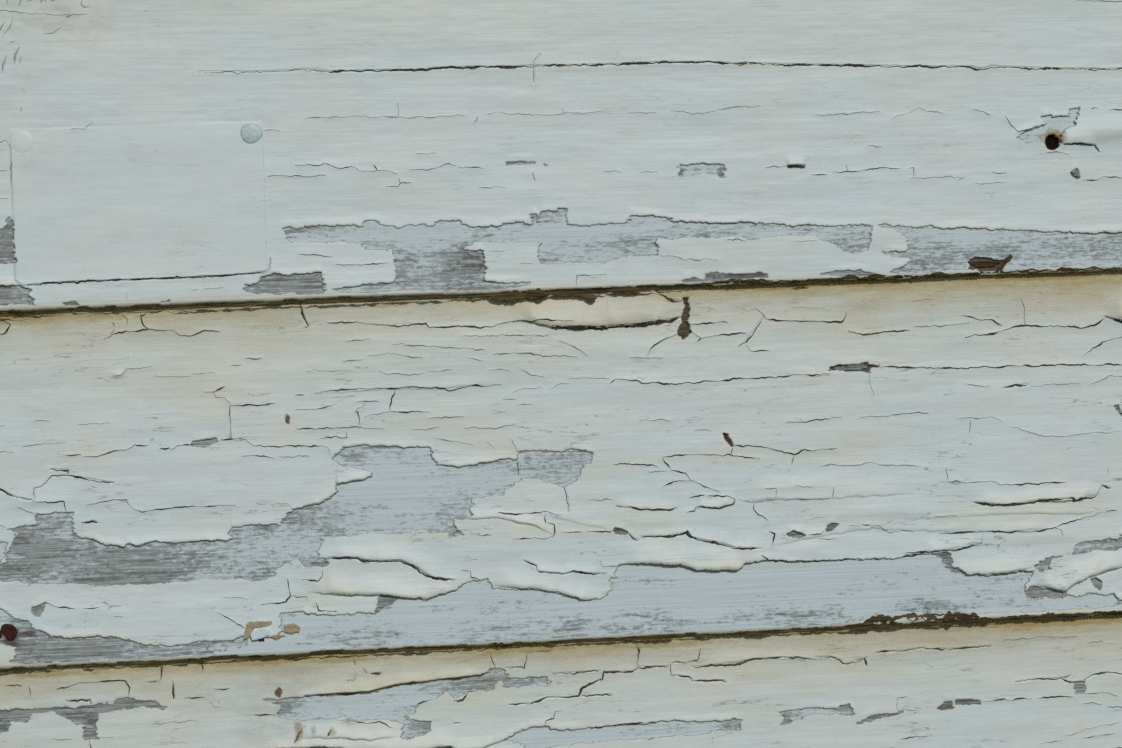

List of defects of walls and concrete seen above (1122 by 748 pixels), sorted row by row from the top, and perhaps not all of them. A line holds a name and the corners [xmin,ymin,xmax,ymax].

crack [209,56,1122,83]
crack [1047,142,1120,181]
peeling [0,218,34,305]
peeling [243,209,1122,295]
crack [117,289,1122,475]
crack [475,417,1116,575]
peeling [0,445,1122,664]
peeling [0,698,166,740]
crack [5,661,229,725]
peeling [266,669,742,748]
crack [294,636,1100,743]
crack [983,672,1122,748]